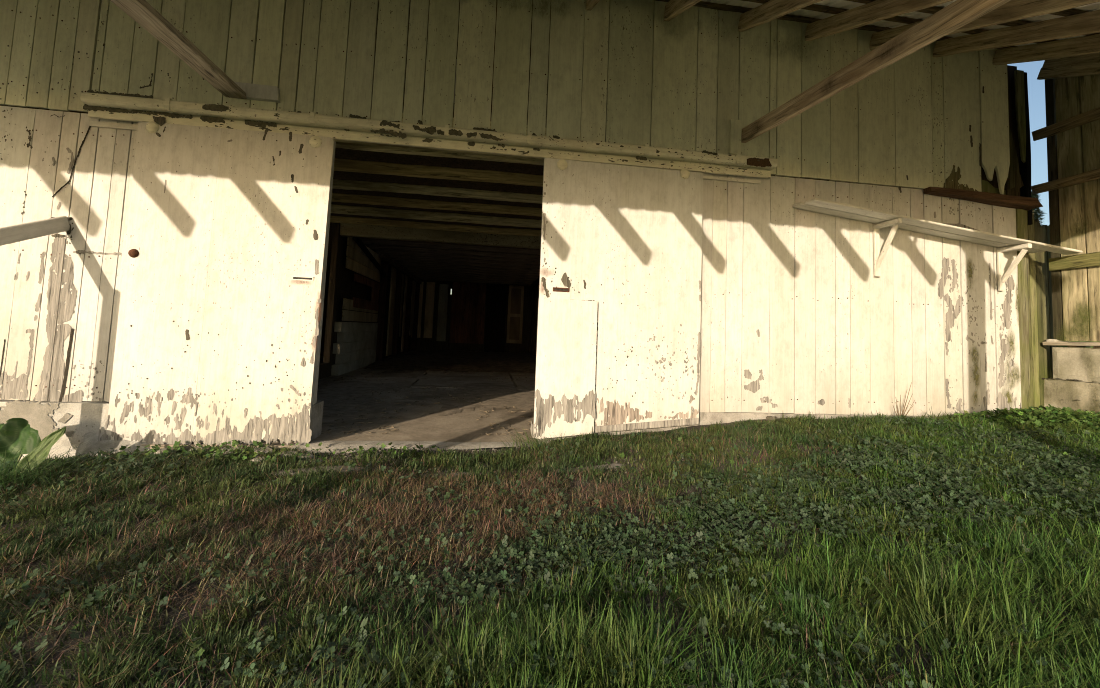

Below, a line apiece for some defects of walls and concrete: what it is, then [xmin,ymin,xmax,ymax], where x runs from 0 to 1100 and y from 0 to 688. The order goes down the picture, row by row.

peeling [0,83,74,192]
crack [52,126,91,197]
peeling [333,114,563,154]
peeling [595,142,760,174]
peeling [932,143,989,224]
peeling [530,181,701,438]
peeling [938,257,1022,416]